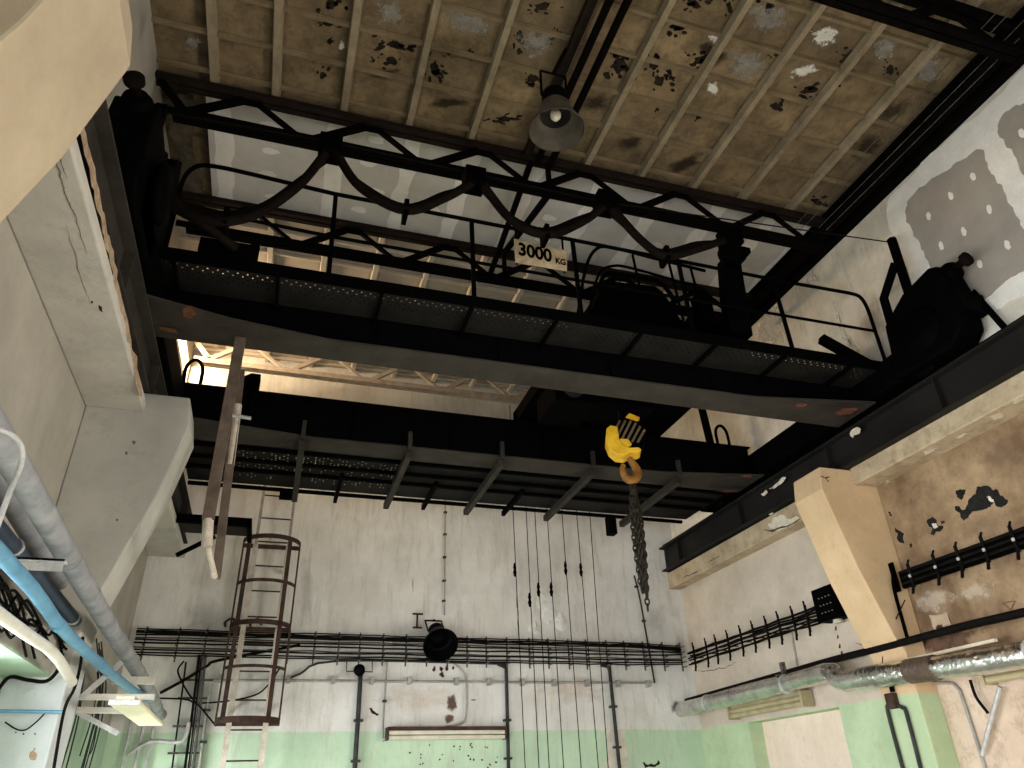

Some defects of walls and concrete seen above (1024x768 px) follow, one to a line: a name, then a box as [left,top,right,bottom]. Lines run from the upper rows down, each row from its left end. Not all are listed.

peeling [513,30,529,55]
peeling [424,52,452,83]
peeling [603,48,676,92]
crack [56,159,90,302]
peeling [955,486,1008,521]
spalling [765,512,800,532]
peeling [927,517,945,536]
corrosion [445,695,457,723]